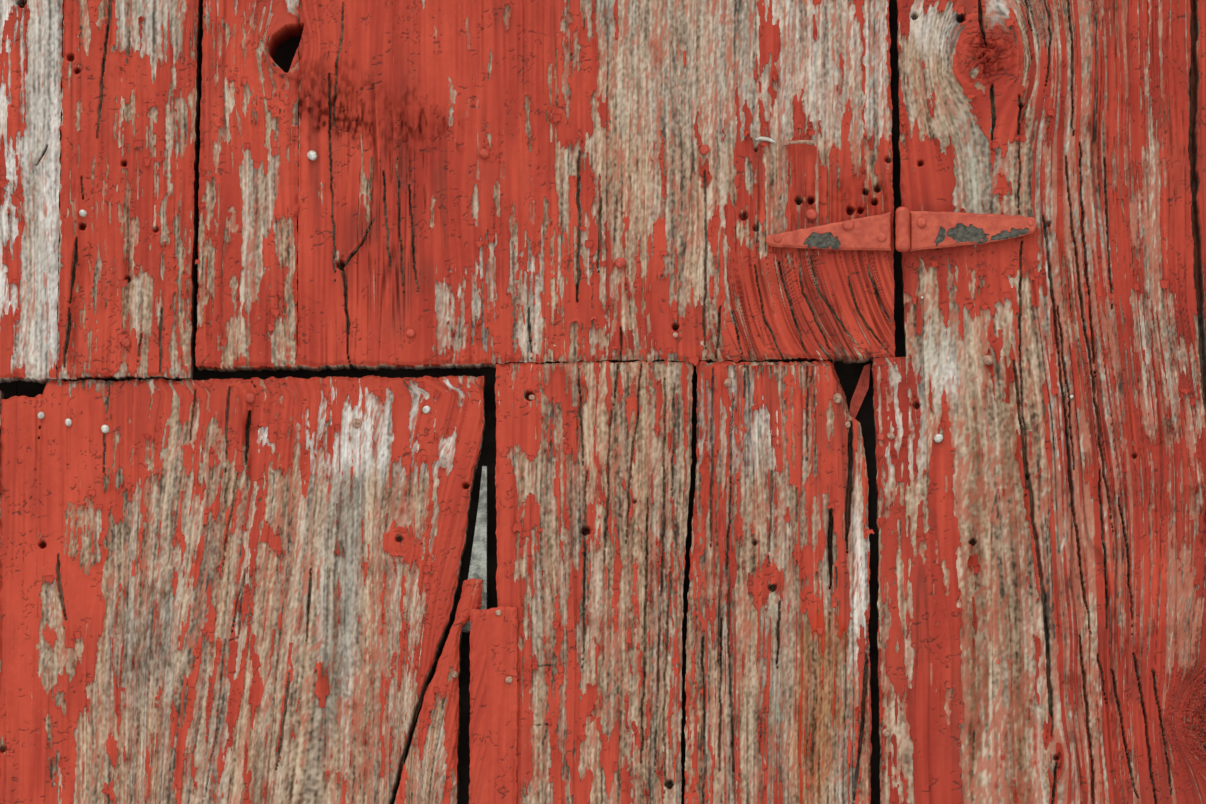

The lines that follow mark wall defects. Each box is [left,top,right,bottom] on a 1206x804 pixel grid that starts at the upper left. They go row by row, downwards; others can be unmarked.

peeling [0,0,198,380]
peeling [118,70,297,373]
peeling [36,377,456,804]
peeling [285,0,299,15]
crack [328,3,419,363]
peeling [432,0,1206,804]
crack [1188,0,1206,412]